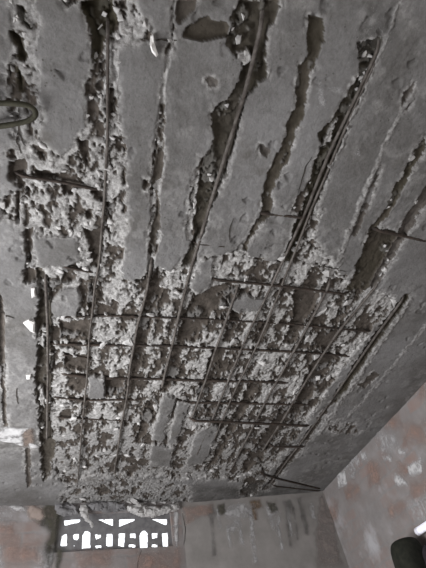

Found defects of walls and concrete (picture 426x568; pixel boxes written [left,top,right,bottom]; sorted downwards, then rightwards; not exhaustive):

spalling [0,0,282,391]
spalling [205,15,426,381]
spalling [23,267,410,528]